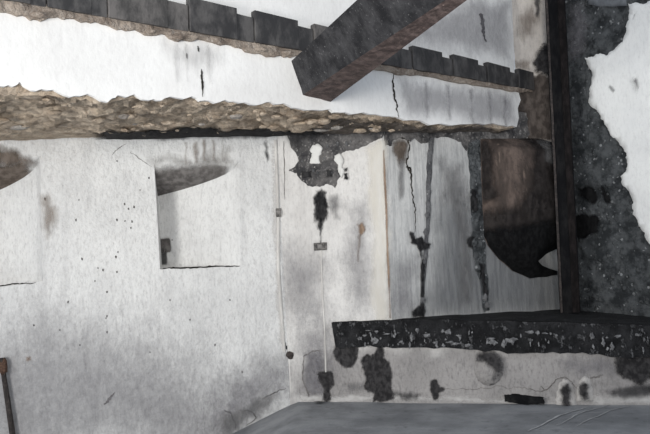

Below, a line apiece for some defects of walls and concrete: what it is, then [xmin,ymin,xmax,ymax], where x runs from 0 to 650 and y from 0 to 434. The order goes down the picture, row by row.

spalling [0,83,530,188]
crack [391,74,399,117]
peeling [585,1,650,244]
leakage [393,140,408,195]
crack [401,137,416,228]
hole [580,186,610,204]
hole [576,214,599,239]
leakage [479,263,488,300]
peeling [590,332,624,351]
leakage [301,347,444,404]